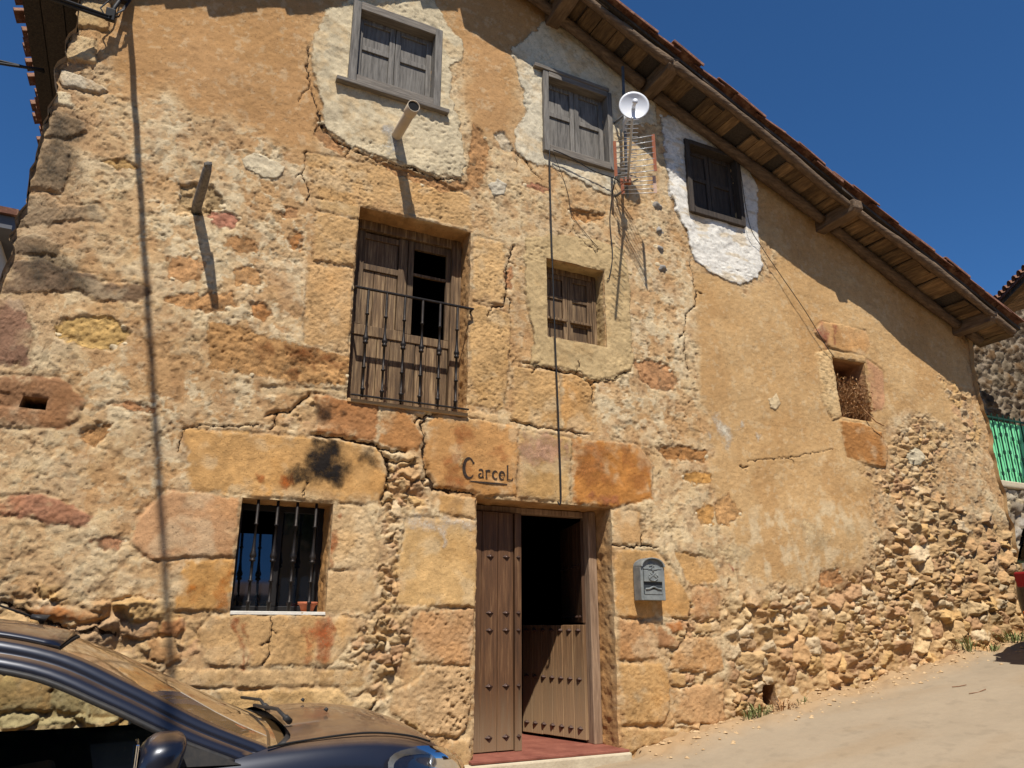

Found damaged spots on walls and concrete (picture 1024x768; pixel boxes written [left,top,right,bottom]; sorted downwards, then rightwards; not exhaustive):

crack [297,49,455,200]
leakage [282,439,349,487]
crack [739,449,833,473]